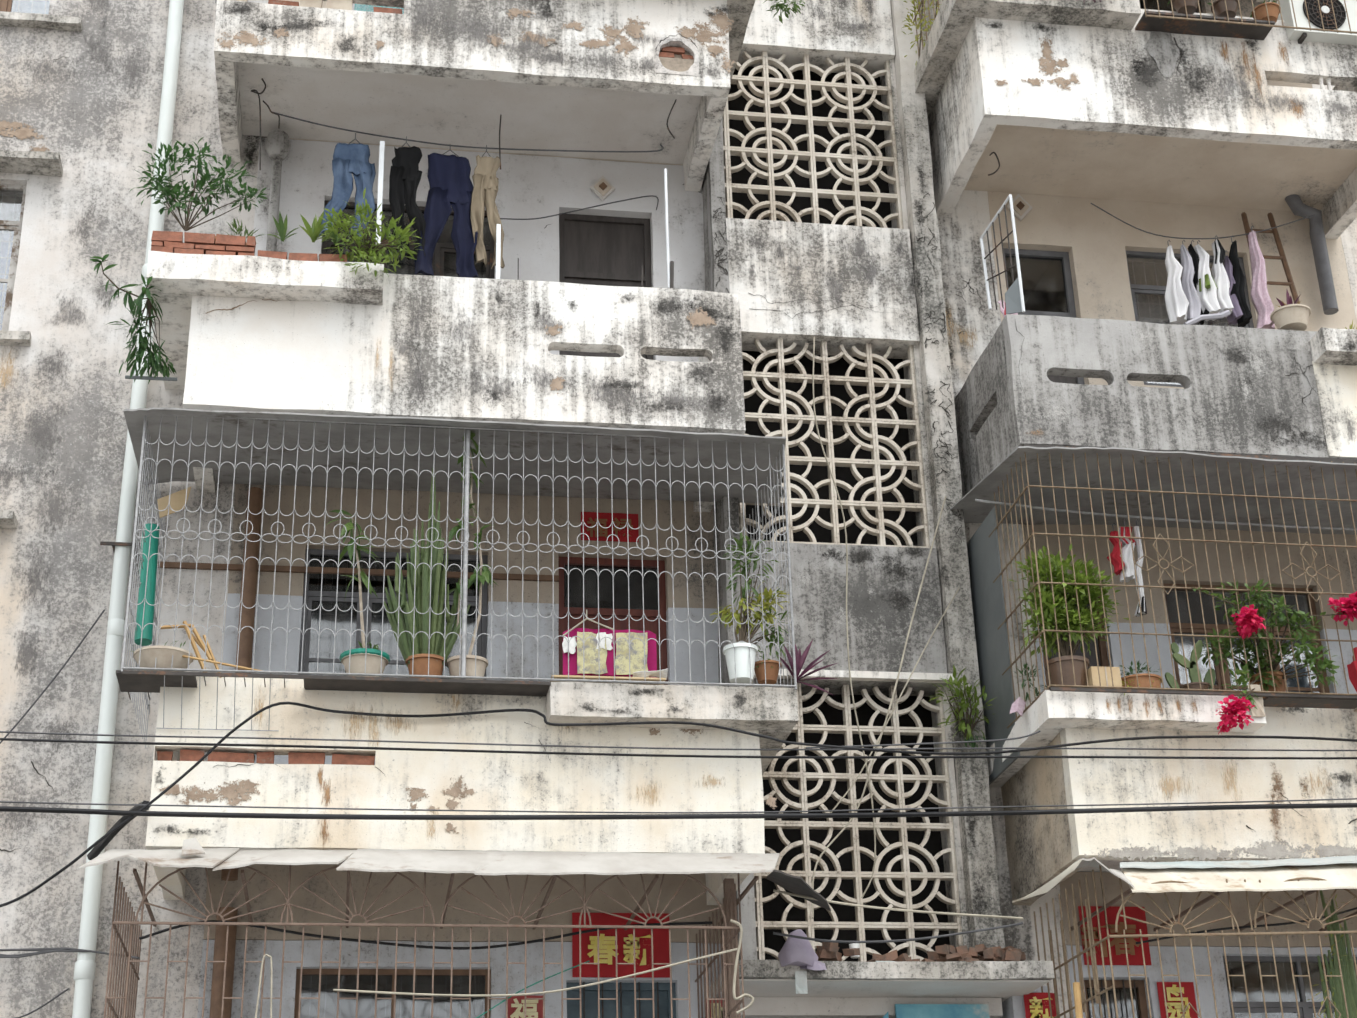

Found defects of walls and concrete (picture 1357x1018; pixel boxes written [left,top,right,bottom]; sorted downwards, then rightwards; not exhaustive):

spalling [486,6,735,77]
peeling [995,37,1080,91]
leakage [1177,44,1304,109]
peeling [0,120,49,152]
leakage [53,298,85,324]
leakage [465,297,735,414]
leakage [1222,349,1263,393]
leakage [1257,416,1327,450]
leakage [0,414,69,531]
leakage [15,632,37,675]
peeling [159,779,261,806]
peeling [406,775,475,834]